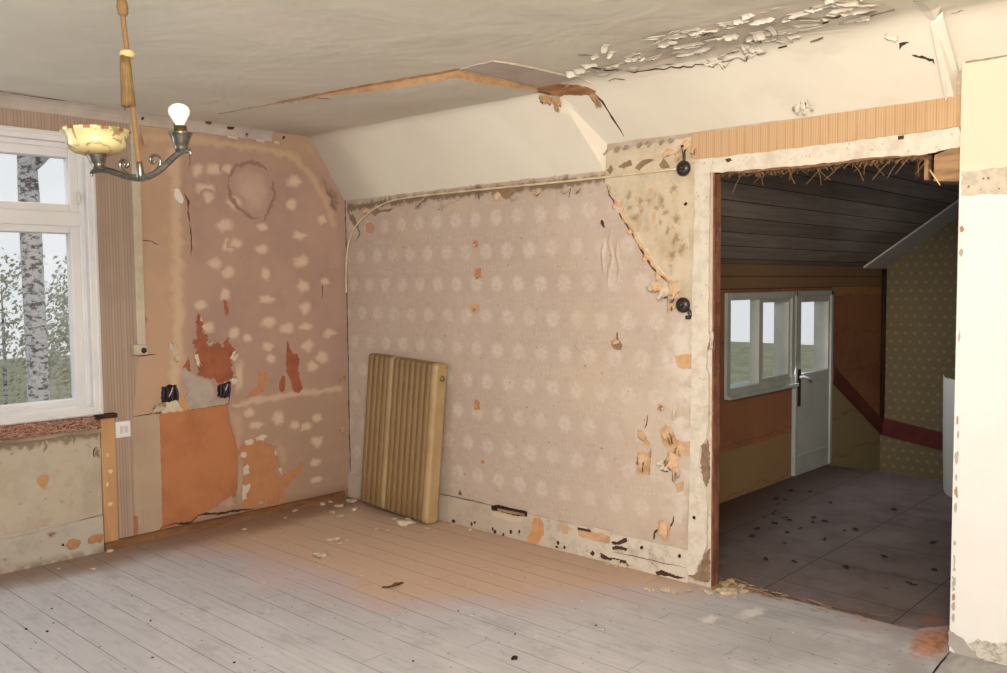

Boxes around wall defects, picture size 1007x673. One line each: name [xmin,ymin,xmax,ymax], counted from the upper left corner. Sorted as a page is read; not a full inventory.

peeling [460,0,901,113]
crack [595,94,624,136]
water stain [226,158,277,222]
spalling [961,166,1007,196]
flaking render [346,137,696,313]
peeling [153,312,303,529]
spalling [636,424,710,493]
peeling [486,511,544,544]
spalling [555,521,629,568]
spalling [655,548,711,583]
spalling [948,541,1007,664]